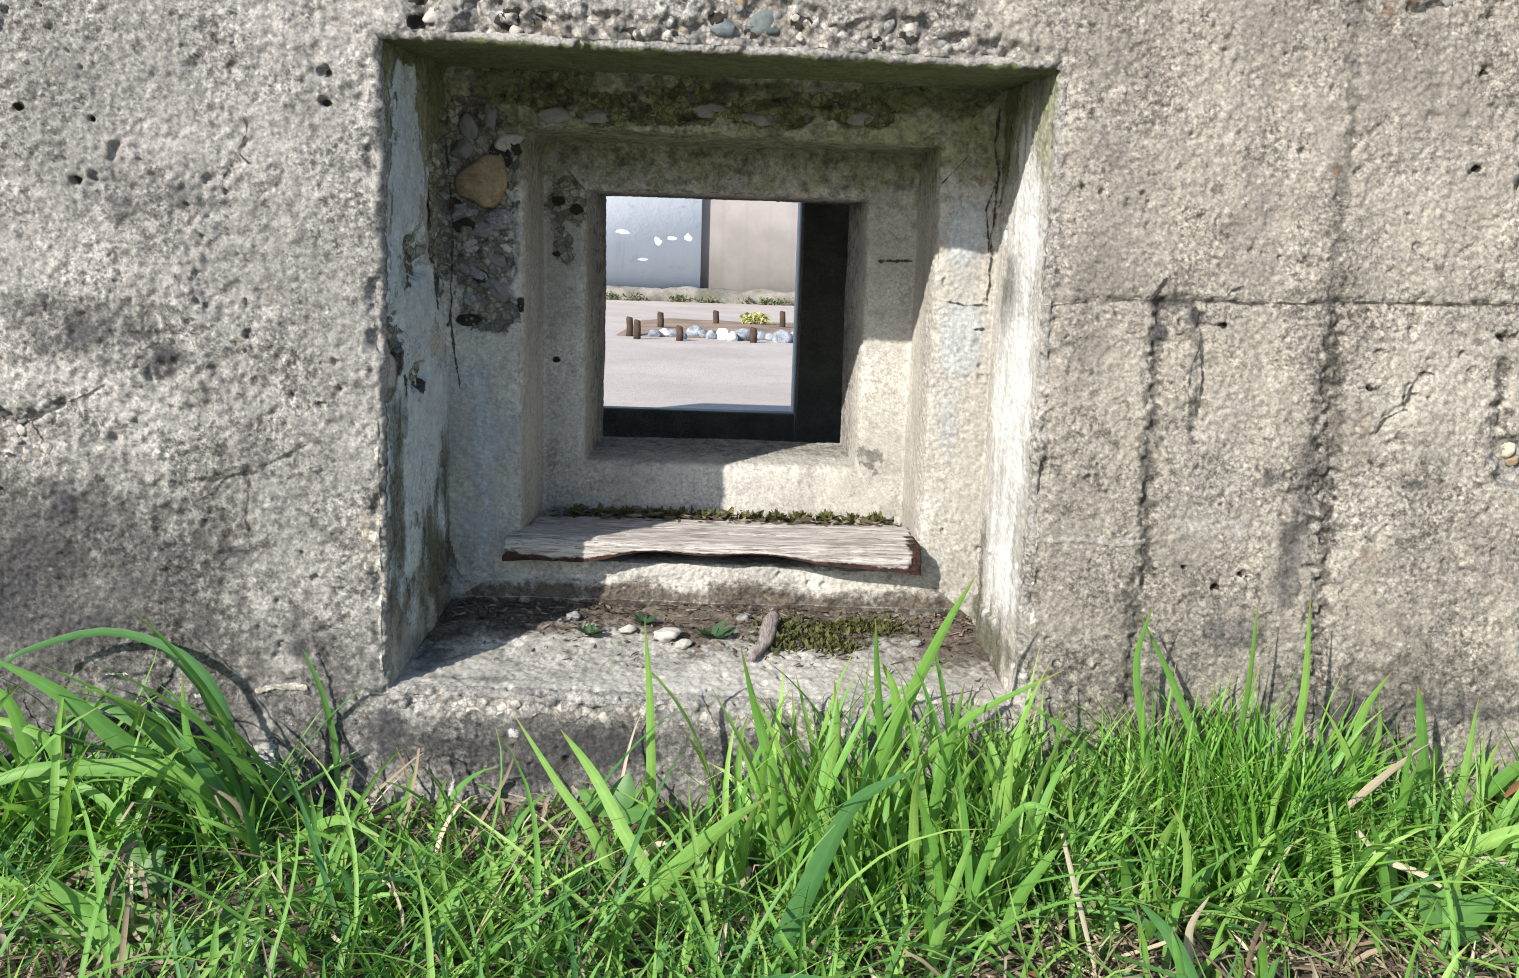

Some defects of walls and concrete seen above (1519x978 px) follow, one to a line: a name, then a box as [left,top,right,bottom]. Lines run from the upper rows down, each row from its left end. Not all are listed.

crack [1410,0,1444,12]
water stain [381,41,446,162]
crack [942,105,1001,331]
peeling [358,58,895,670]
water stain [1151,294,1203,342]